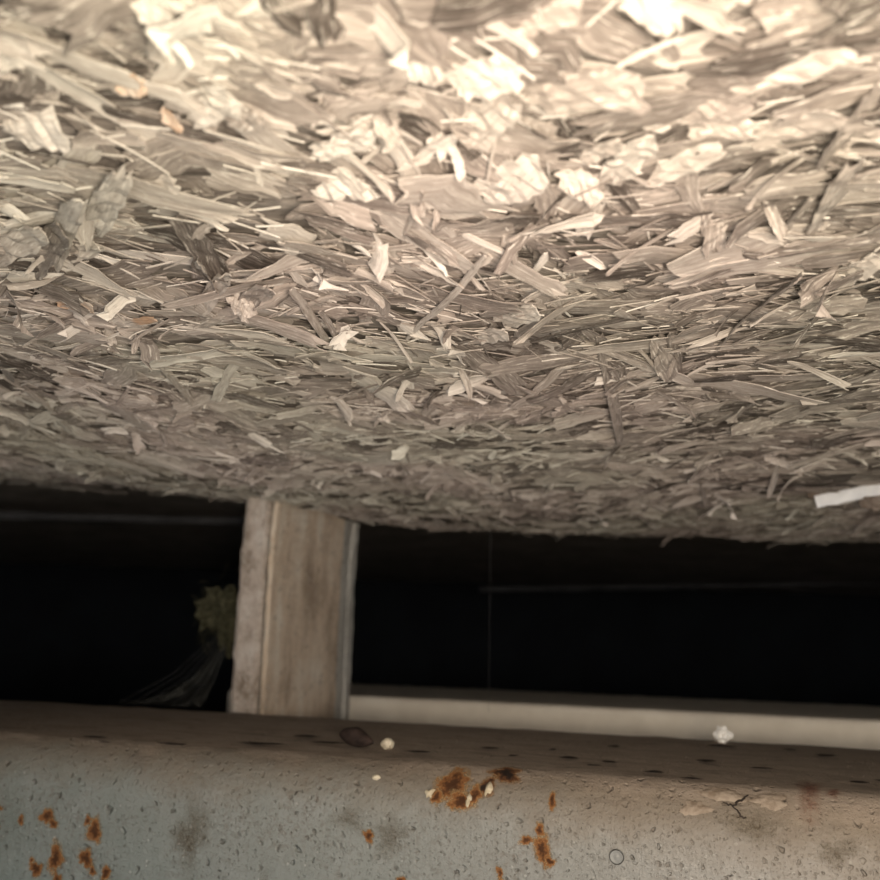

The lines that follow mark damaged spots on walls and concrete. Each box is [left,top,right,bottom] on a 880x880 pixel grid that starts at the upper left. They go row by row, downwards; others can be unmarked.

corrosion [430,767,521,811]
corrosion [38,808,58,828]
corrosion [29,839,65,880]
corrosion [77,814,111,880]
corrosion [518,821,556,869]